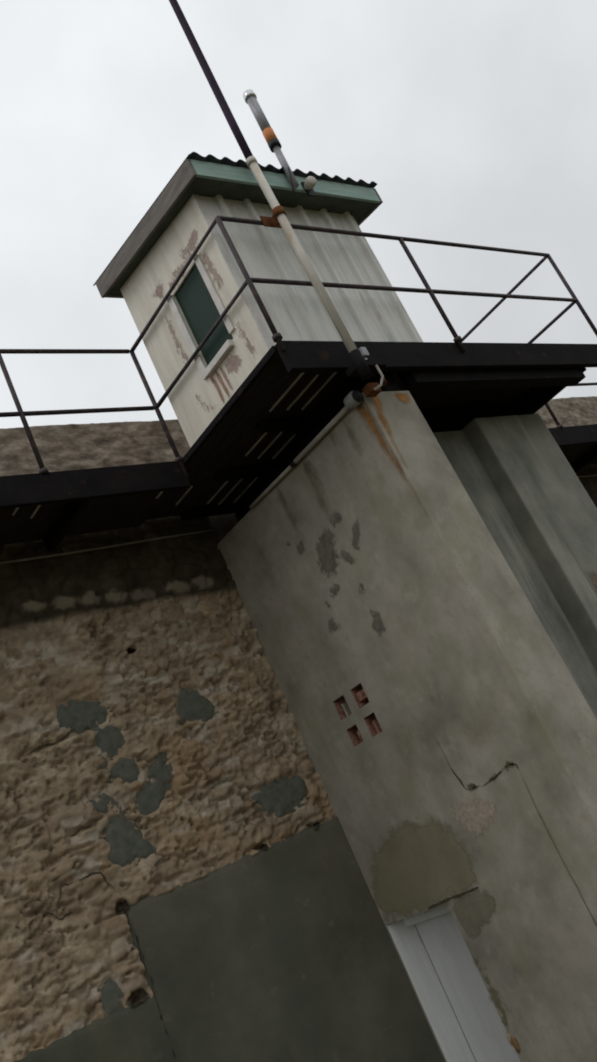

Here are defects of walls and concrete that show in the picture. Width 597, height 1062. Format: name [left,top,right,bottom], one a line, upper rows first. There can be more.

corrosion [209,367,233,403]
corrosion [359,397,400,470]
crack [436,741,597,927]